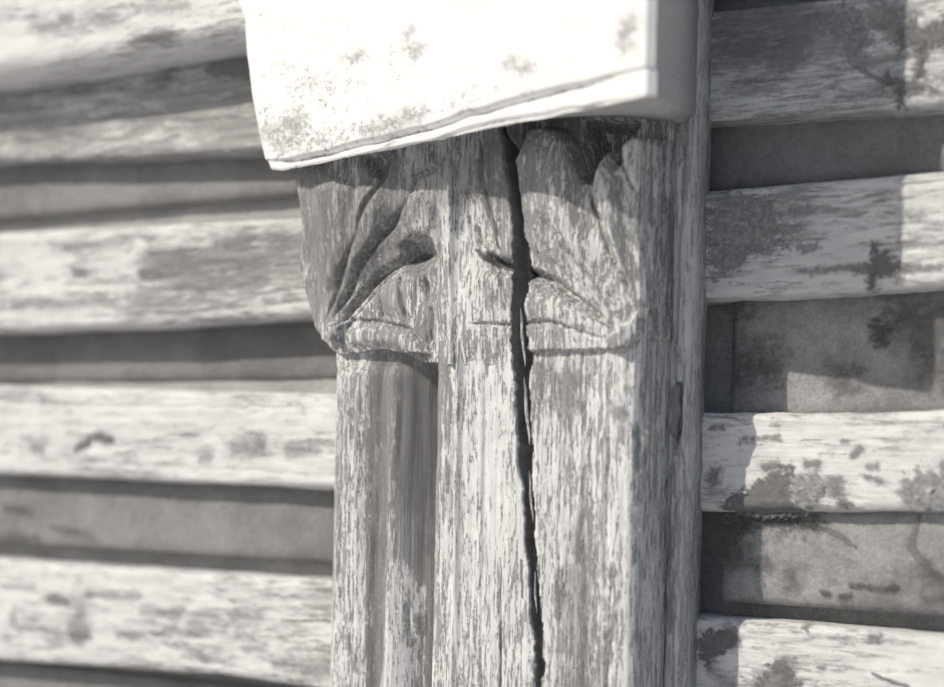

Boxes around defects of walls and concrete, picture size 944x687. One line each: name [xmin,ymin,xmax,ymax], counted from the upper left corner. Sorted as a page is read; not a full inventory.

damp [845,14,944,112]
crack [475,127,546,687]
peeling [530,359,587,433]
peeling [608,399,644,479]
damp [739,434,780,445]
damp [863,461,883,483]
damp [717,511,827,567]
peeling [552,568,570,654]
peeling [599,562,617,669]
damp [696,623,741,670]